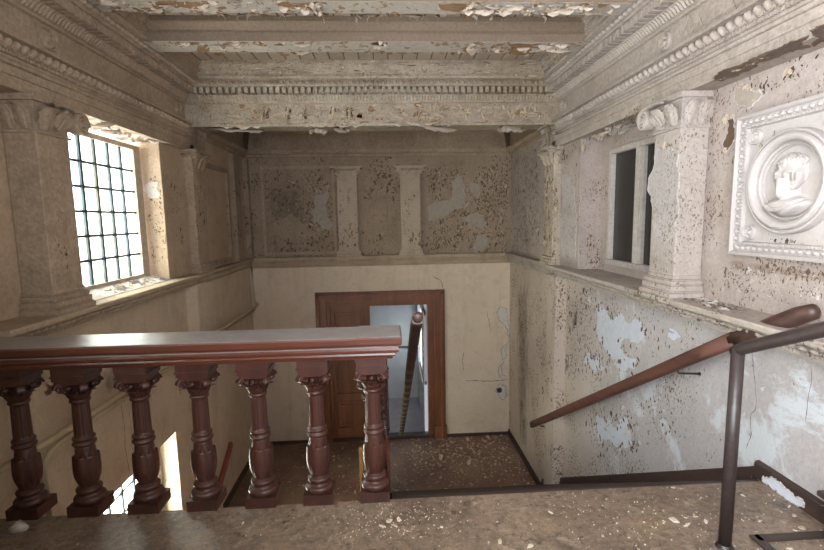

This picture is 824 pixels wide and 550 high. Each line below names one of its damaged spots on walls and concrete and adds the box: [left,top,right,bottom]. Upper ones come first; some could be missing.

peeling [99,0,333,31]
peeling [353,2,620,35]
peeling [175,40,571,77]
spalling [427,164,509,253]
spalling [565,286,682,390]
spalling [584,398,711,458]
spalling [762,475,805,508]